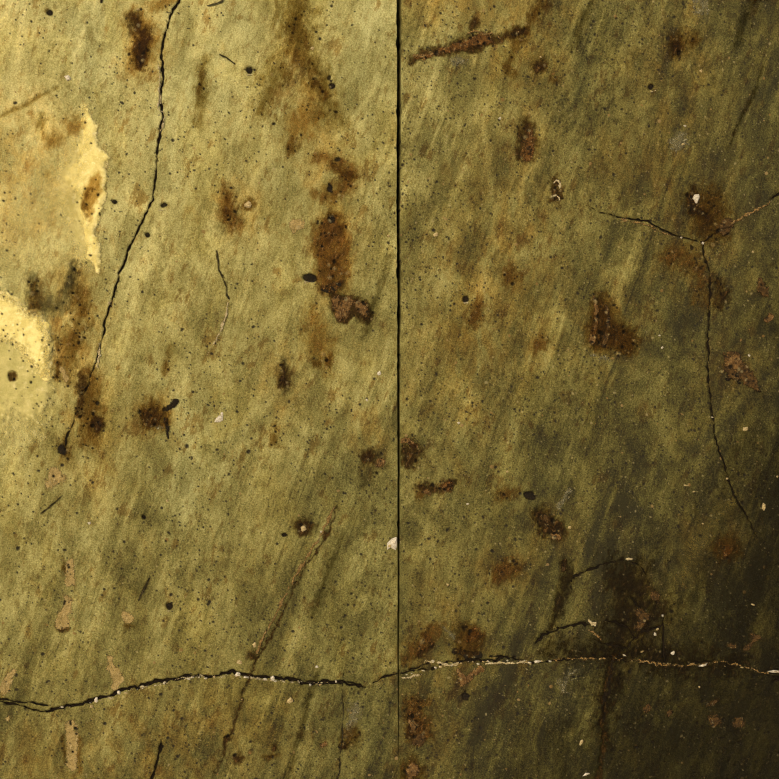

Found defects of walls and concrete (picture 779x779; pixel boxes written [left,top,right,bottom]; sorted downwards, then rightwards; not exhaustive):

rust [131,15,149,67]
crack [65,0,180,449]
rust [320,280,343,294]
crack [578,193,779,538]
crack [0,505,779,779]